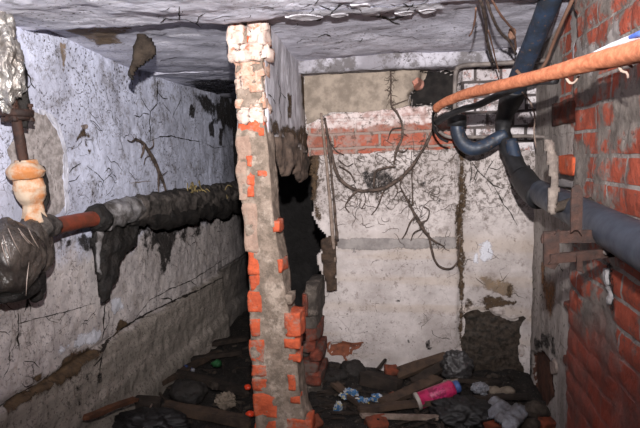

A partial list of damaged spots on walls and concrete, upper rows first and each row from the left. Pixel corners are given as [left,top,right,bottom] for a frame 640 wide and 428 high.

crack [50,80,226,198]
mould [188,79,238,181]
flaking render [304,66,513,156]
peeling [510,86,536,151]
damp [455,186,467,238]
efflorescence [473,241,493,263]
crack [0,219,235,407]
damp [461,285,532,378]